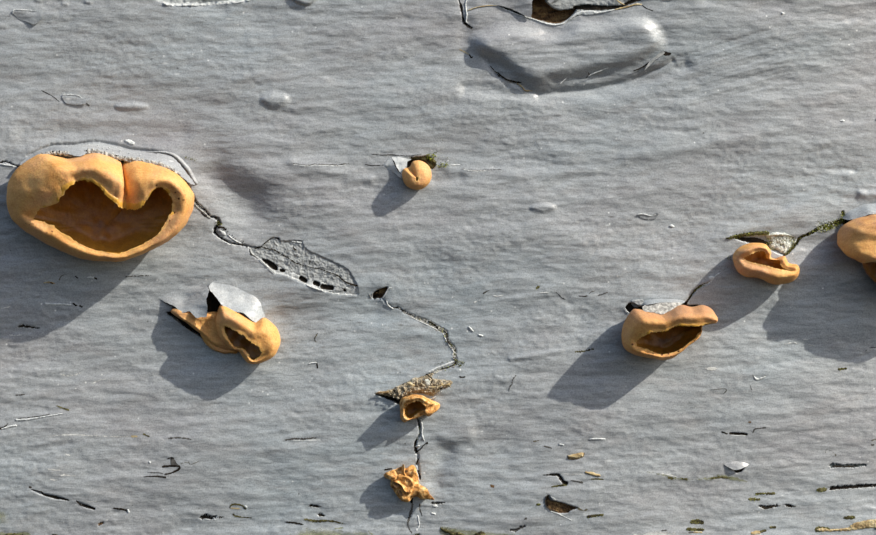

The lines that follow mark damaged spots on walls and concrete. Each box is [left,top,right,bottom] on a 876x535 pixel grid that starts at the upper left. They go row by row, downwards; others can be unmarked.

peeling [460,0,653,26]
peeling [644,51,675,72]
crack [187,183,248,248]
spalling [249,237,358,296]
peeling [160,283,265,336]
crack [386,300,465,376]
spalling [375,373,453,404]
crack [285,435,319,443]
crack [407,418,428,535]